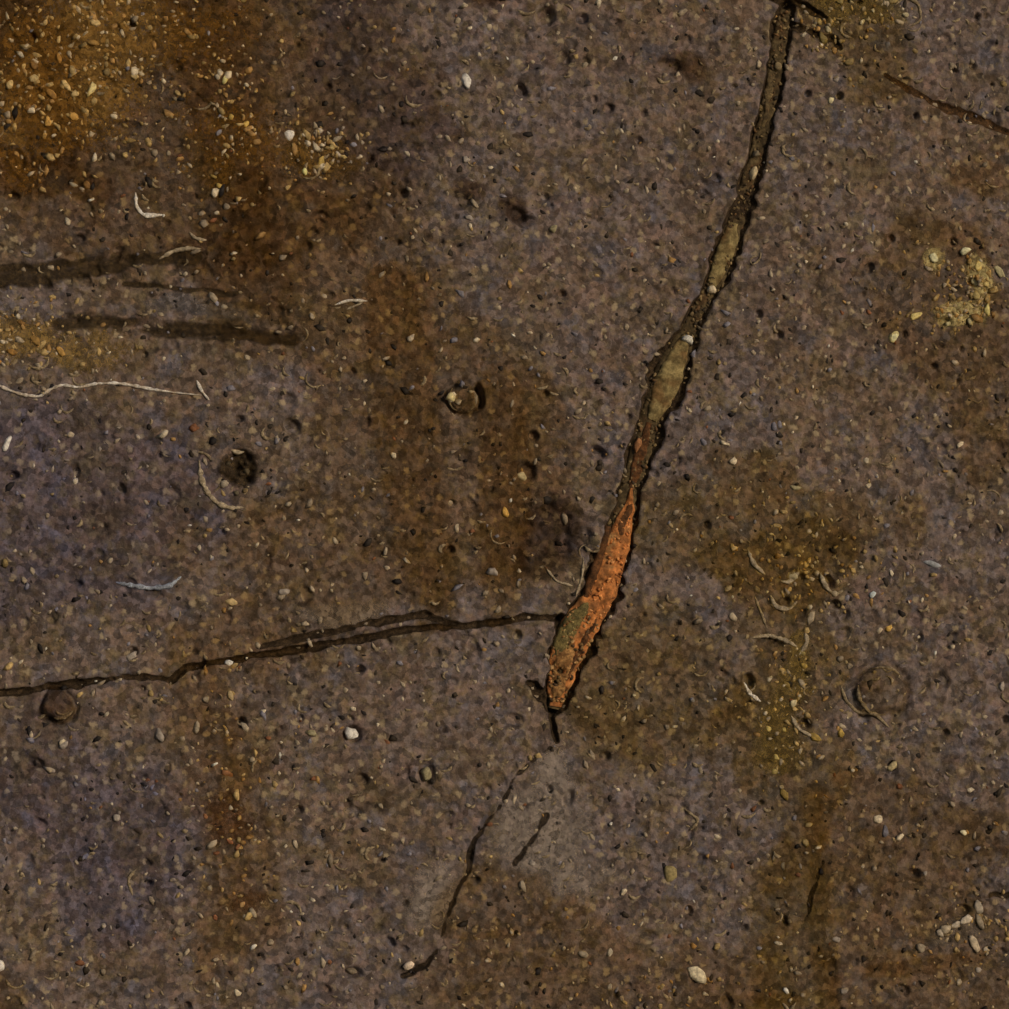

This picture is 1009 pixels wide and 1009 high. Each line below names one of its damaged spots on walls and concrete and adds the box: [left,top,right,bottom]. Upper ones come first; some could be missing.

crack [884,73,1009,136]
crack [0,0,843,937]
corrosion [546,488,635,707]
crack [400,948,438,979]